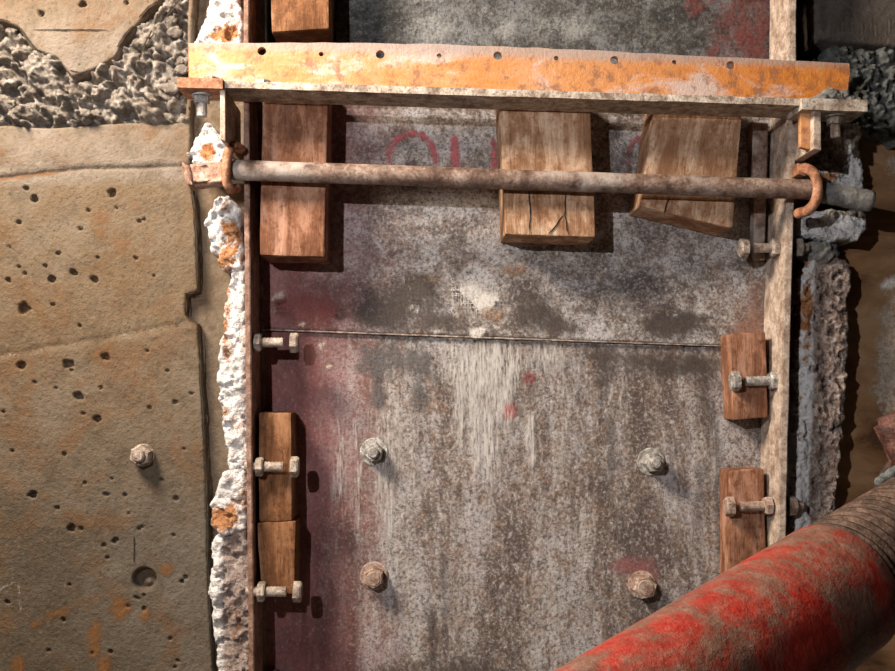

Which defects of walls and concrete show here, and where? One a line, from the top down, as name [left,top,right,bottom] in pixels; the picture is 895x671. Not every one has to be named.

spalling [0,0,190,129]
crack [185,189,212,661]